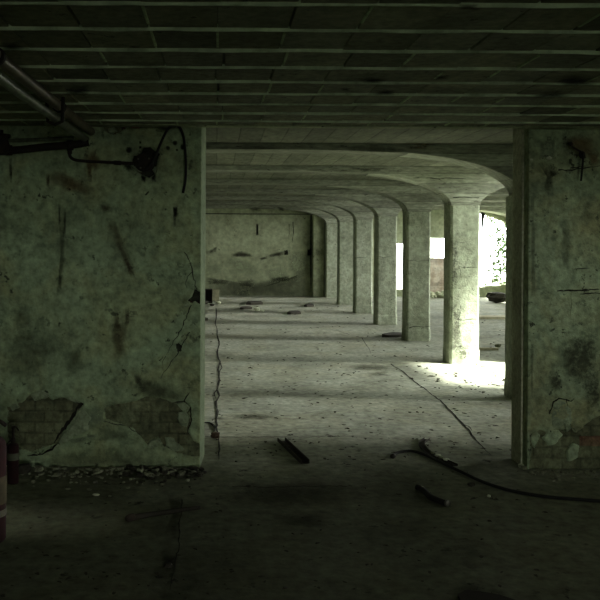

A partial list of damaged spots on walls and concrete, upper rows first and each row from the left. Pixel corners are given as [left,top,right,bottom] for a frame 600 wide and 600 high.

crack [158,252,197,379]
crack [557,289,600,314]
spalling [7,390,91,452]
spalling [104,397,200,456]
crack [205,309,222,456]
crack [391,364,491,455]
spalling [529,416,600,469]